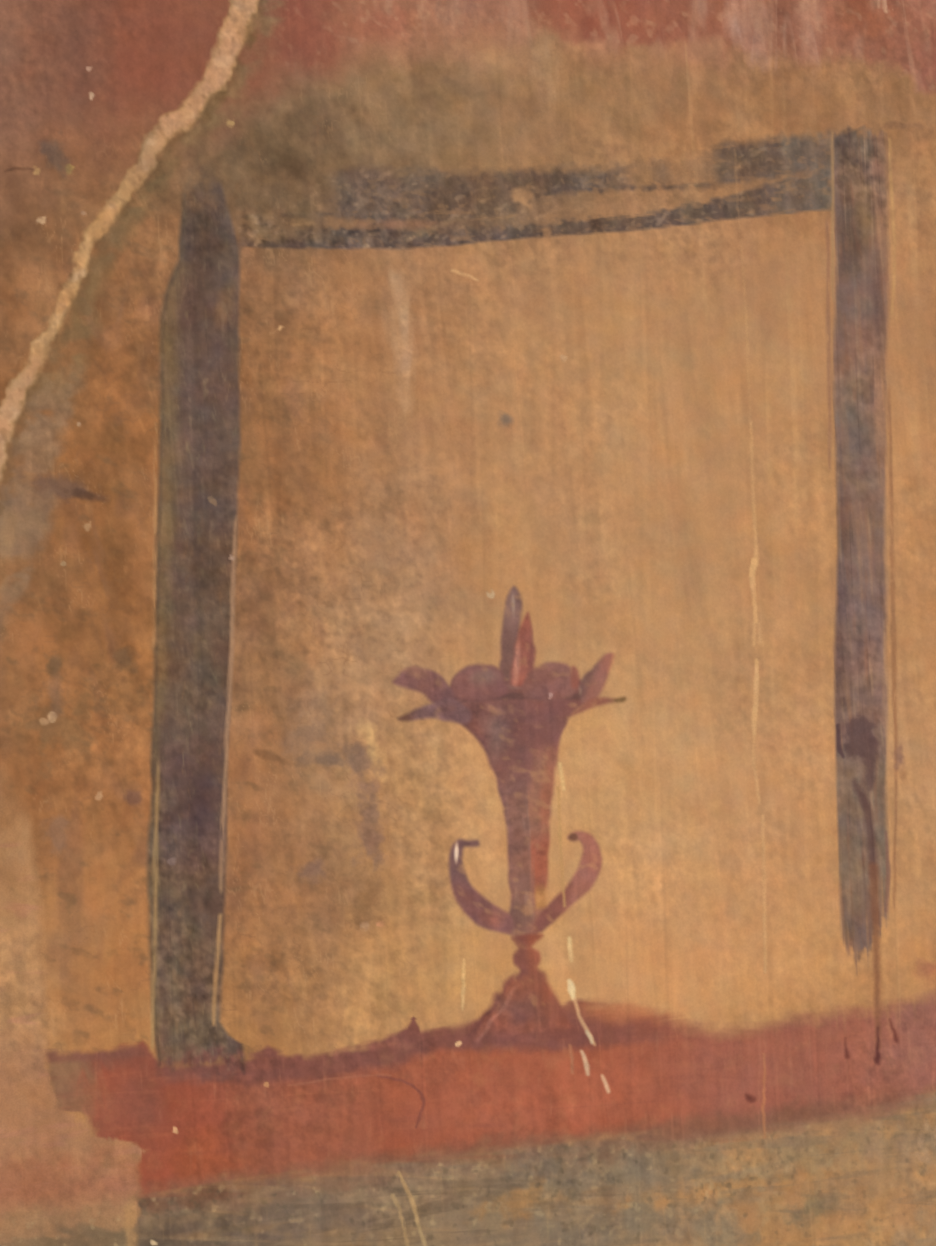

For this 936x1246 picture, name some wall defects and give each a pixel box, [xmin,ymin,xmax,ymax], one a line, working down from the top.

crack [0,0,290,650]
peeling [565,935,612,1096]